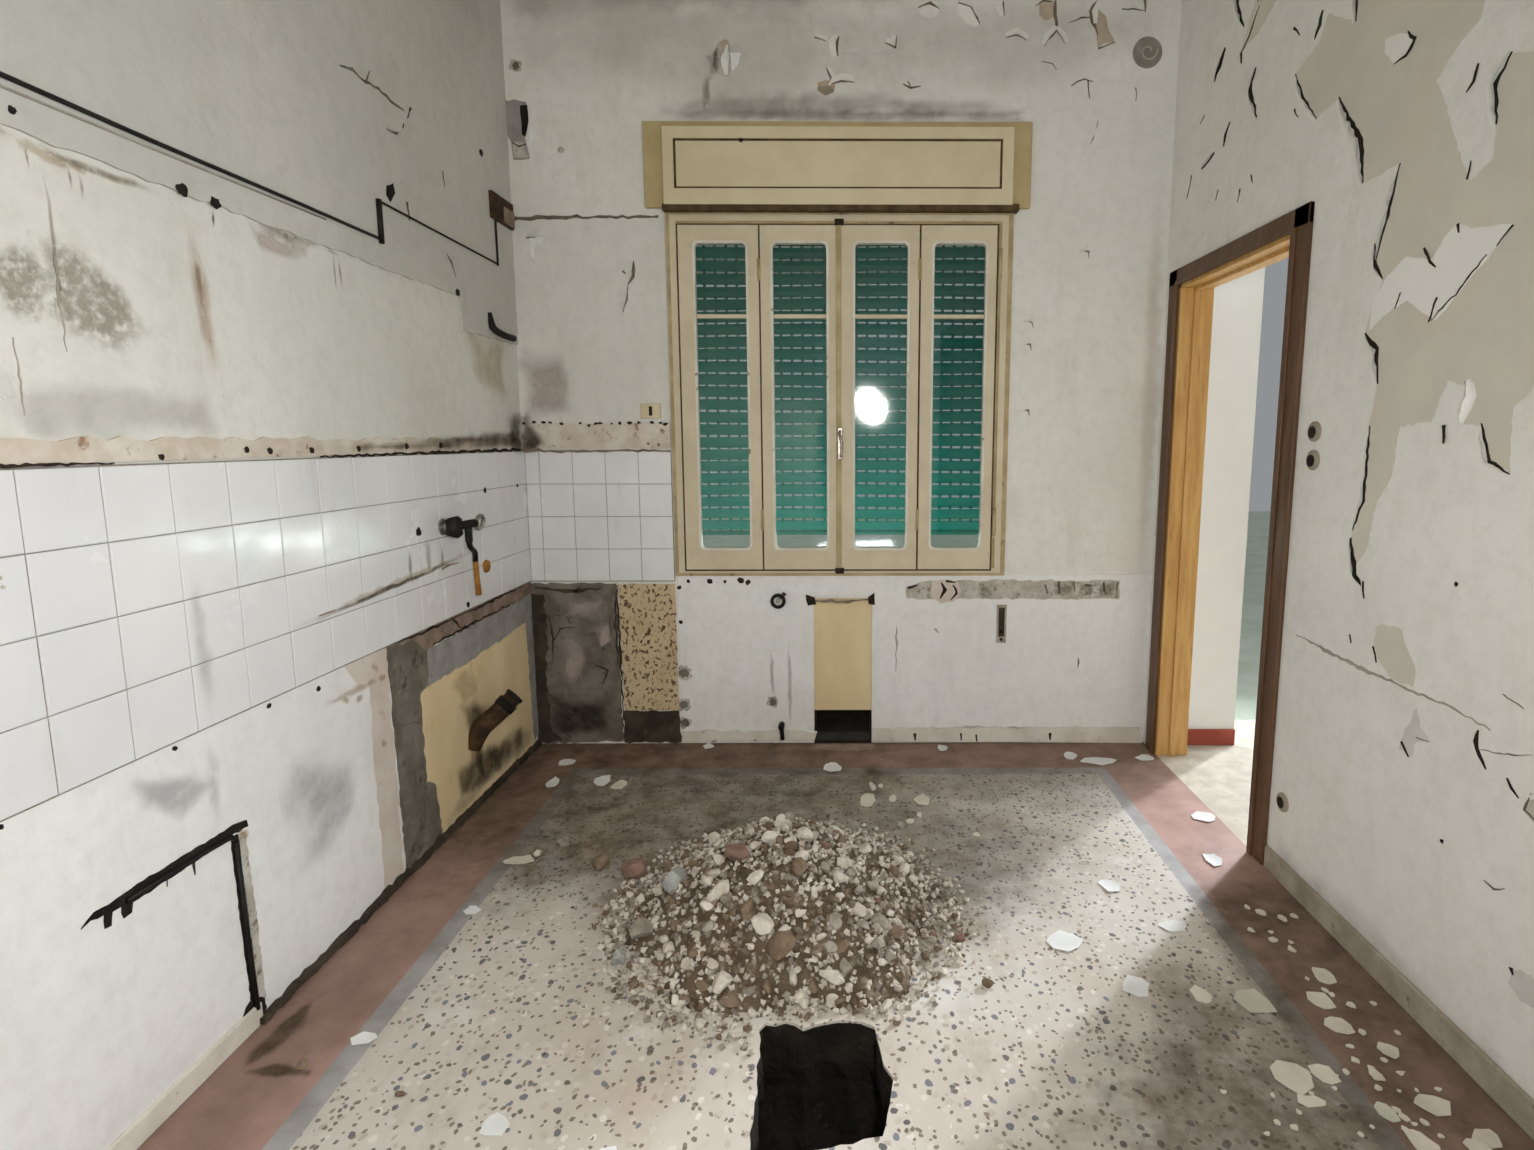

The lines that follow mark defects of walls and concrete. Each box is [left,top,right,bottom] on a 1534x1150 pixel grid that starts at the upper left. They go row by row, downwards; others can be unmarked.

peeling [713,39,741,77]
peeling [815,32,897,96]
peeling [1035,0,1115,70]
peeling [1240,0,1276,54]
crack [339,65,412,135]
peeling [1294,0,1534,563]
peeling [1372,624,1415,687]
peeling [384,582,692,868]
peeling [1399,708,1430,757]
peeling [1523,793,1534,822]